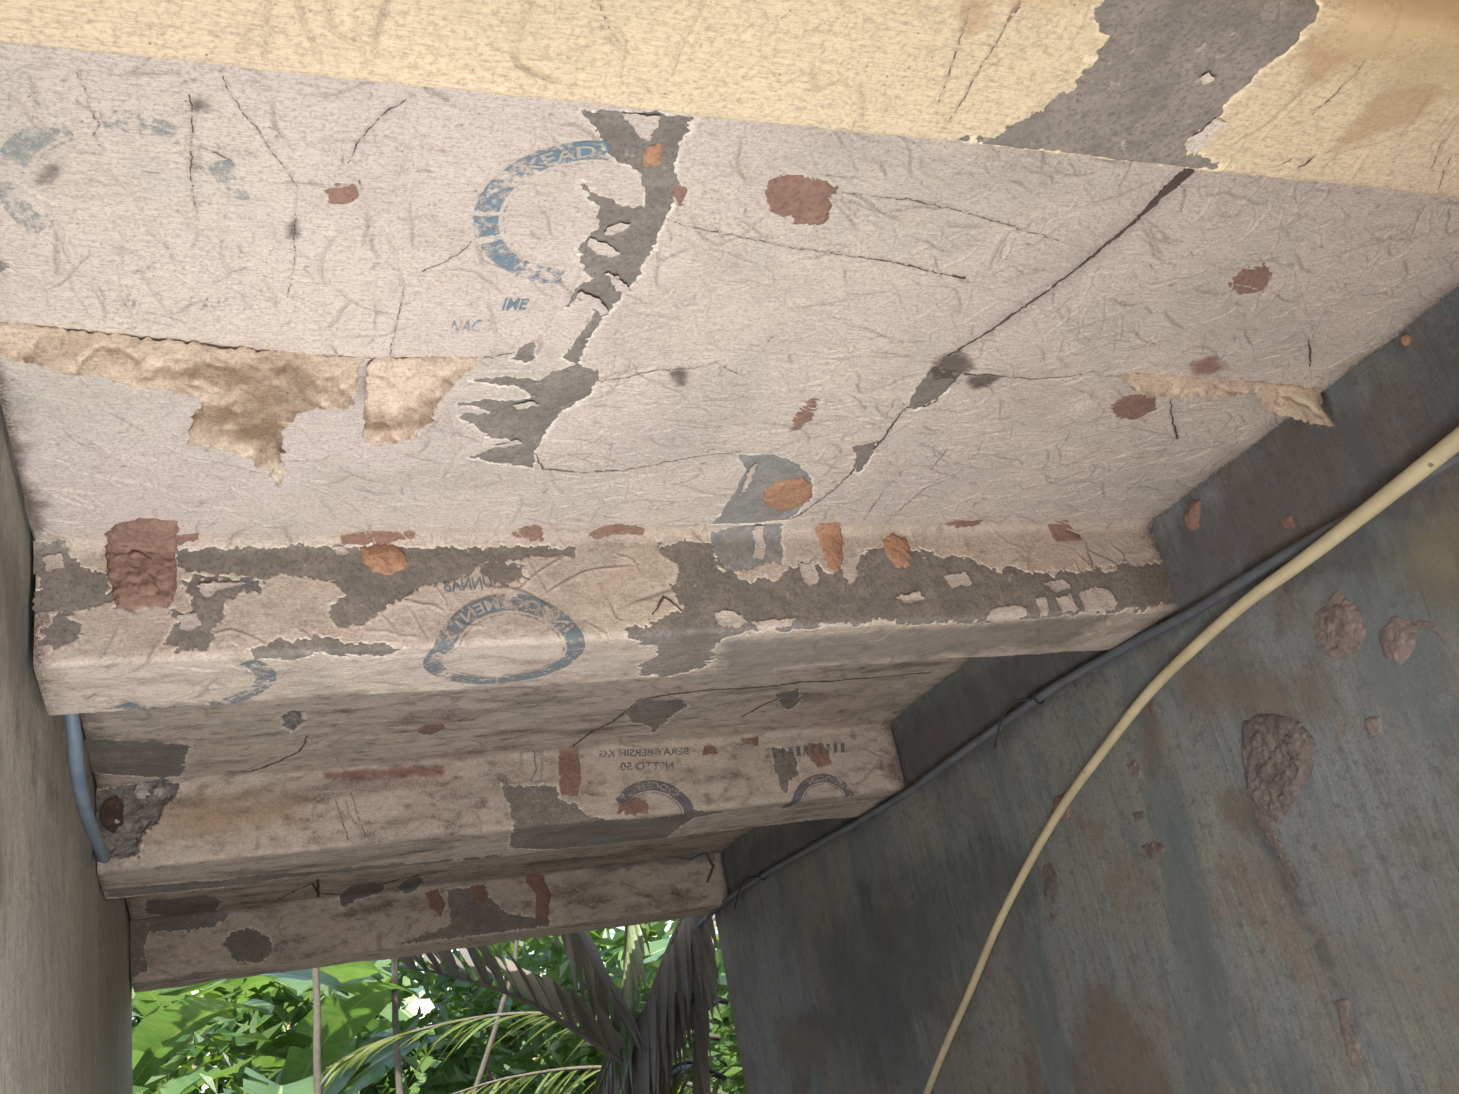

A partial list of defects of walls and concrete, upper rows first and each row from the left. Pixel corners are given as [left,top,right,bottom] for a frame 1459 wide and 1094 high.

peeling [957,0,1319,170]
peeling [457,110,694,468]
crack [792,168,1195,520]
peeling [32,539,116,650]
peeling [163,542,576,660]
peeling [625,454,1177,677]
spalling [84,739,191,859]
peeling [101,784,726,977]